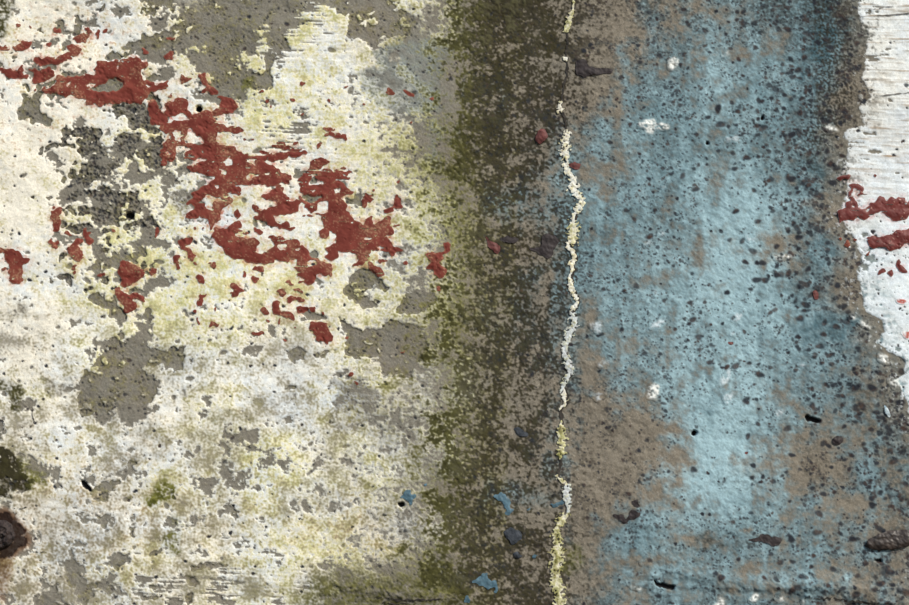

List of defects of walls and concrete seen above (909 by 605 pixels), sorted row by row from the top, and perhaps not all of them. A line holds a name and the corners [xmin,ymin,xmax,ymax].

peeling [334,0,455,124]
peeling [0,0,408,364]
peeling [42,332,185,417]
peeling [326,372,378,435]
peeling [339,242,451,378]
crack [547,0,586,605]
peeling [567,0,909,572]
rust [0,503,37,605]